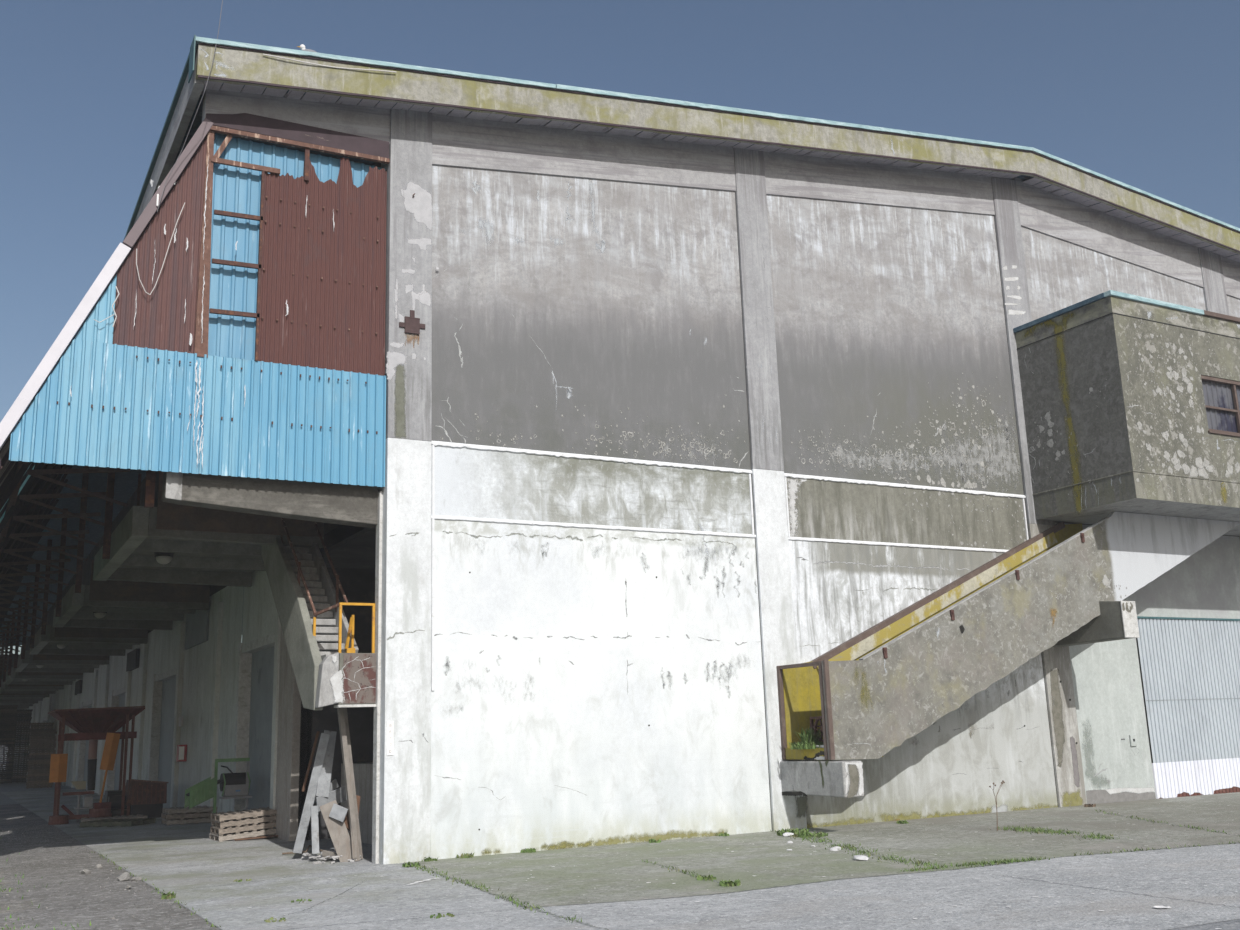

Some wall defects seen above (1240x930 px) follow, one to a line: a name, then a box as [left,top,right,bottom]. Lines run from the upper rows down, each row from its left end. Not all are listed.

peeling [394,182,433,322]
damp [822,418,1019,492]
crack [391,531,734,545]